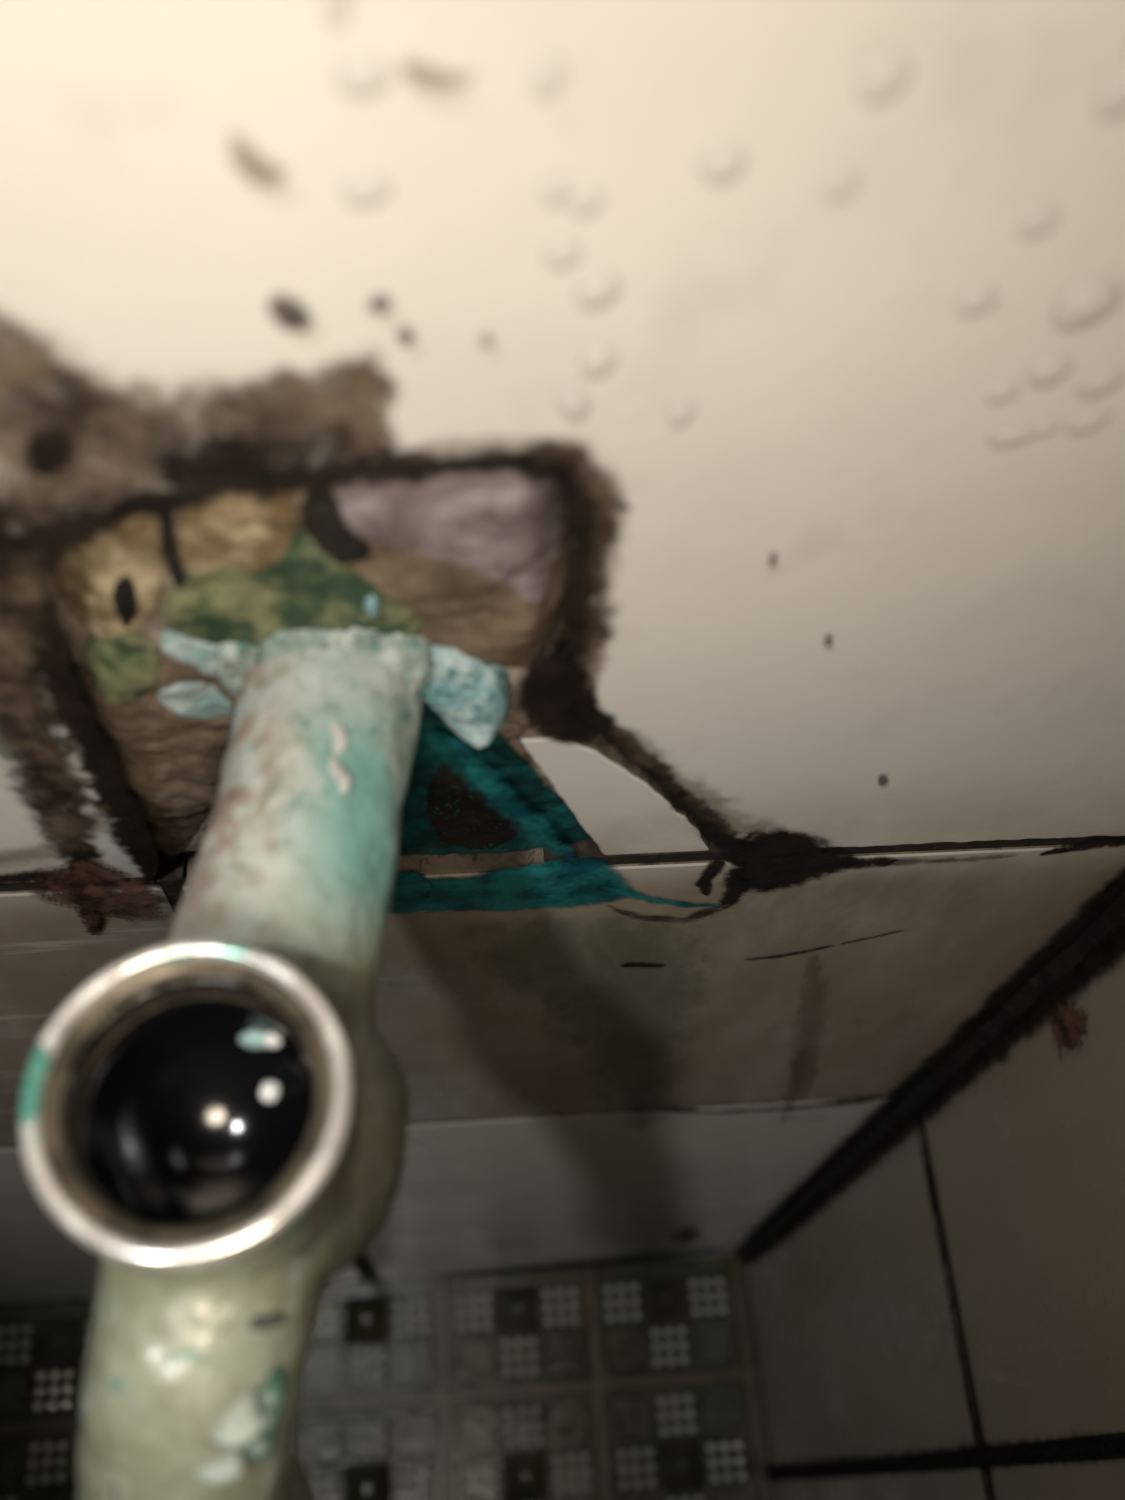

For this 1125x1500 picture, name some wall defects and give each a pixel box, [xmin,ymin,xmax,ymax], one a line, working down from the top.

leakage [268,298,310,331]
leakage [369,299,391,315]
leakage [0,320,629,931]
spalling [47,470,591,856]
crack [569,703,748,922]
rust [33,860,165,935]
crack [620,961,665,969]